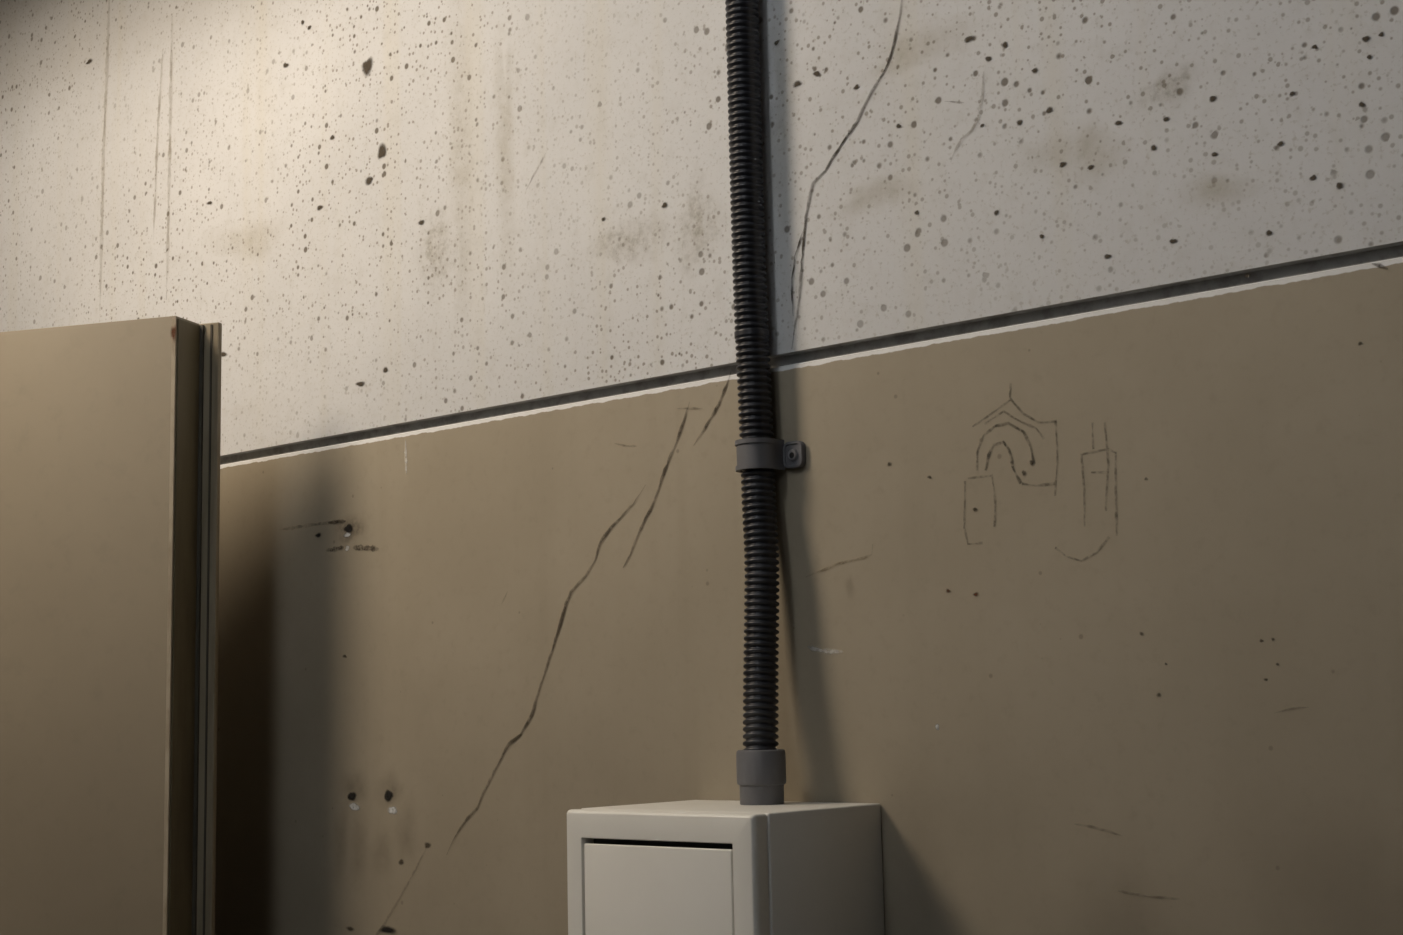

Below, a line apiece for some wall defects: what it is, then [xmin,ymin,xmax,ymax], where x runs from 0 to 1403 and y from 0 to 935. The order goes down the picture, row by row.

crack [791,21,899,338]
crack [546,383,728,666]
crack [498,702,536,764]